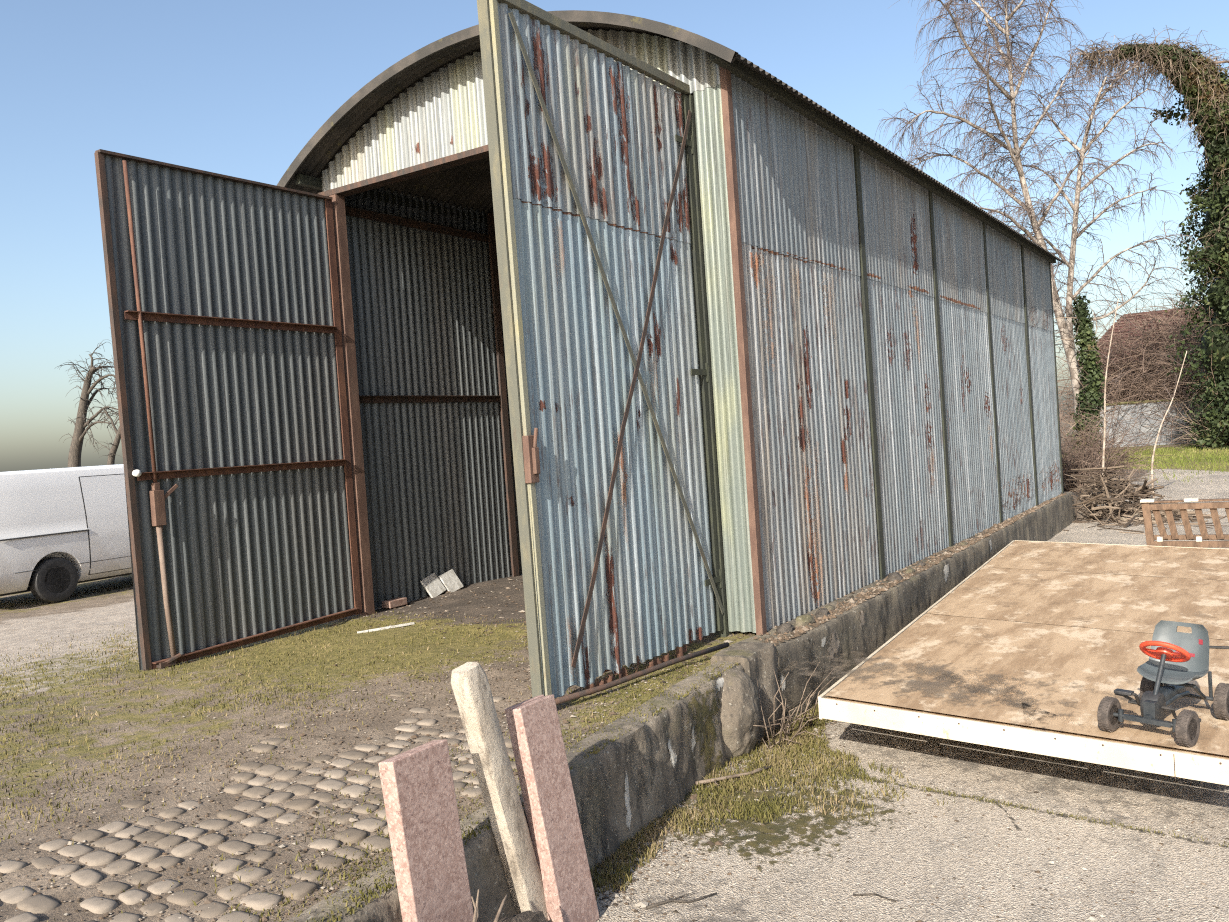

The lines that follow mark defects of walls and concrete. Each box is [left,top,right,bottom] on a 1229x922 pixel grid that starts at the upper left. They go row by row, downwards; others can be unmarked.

rust [521,31,690,265]
rust [907,214,980,310]
rust [797,327,812,452]
rust [884,328,912,369]
rust [923,373,934,448]
rust [804,467,820,604]
rust [581,535,703,697]